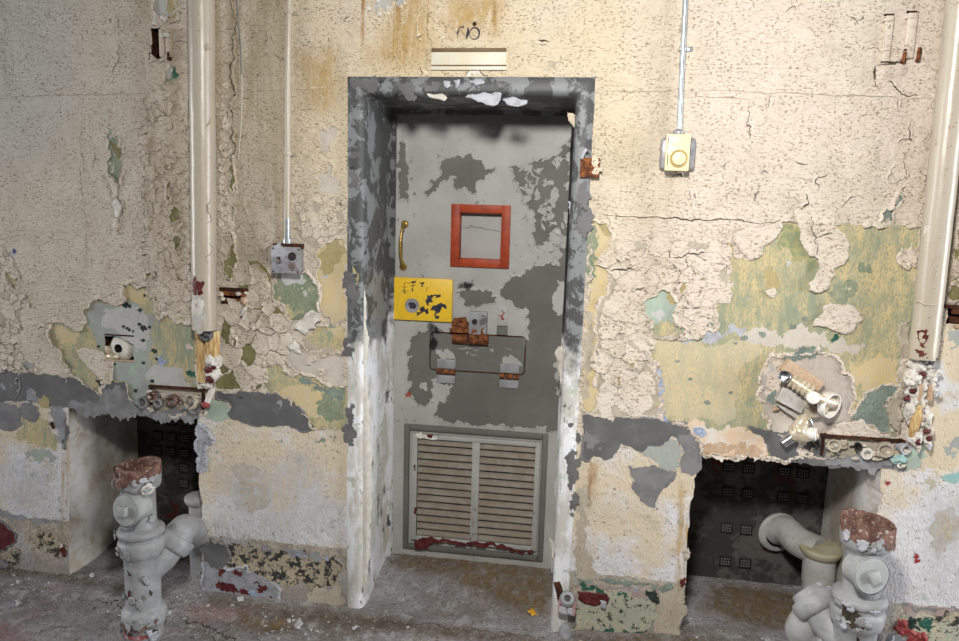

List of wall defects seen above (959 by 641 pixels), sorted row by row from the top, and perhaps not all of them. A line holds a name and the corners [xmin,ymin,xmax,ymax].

peeling [350,75,379,94]
peeling [393,70,528,107]
crack [204,0,346,264]
peeling [0,61,359,475]
crack [220,360,247,378]
peeling [396,112,959,635]
peeling [0,509,67,565]
peeling [200,538,347,606]
peeling [886,602,959,641]